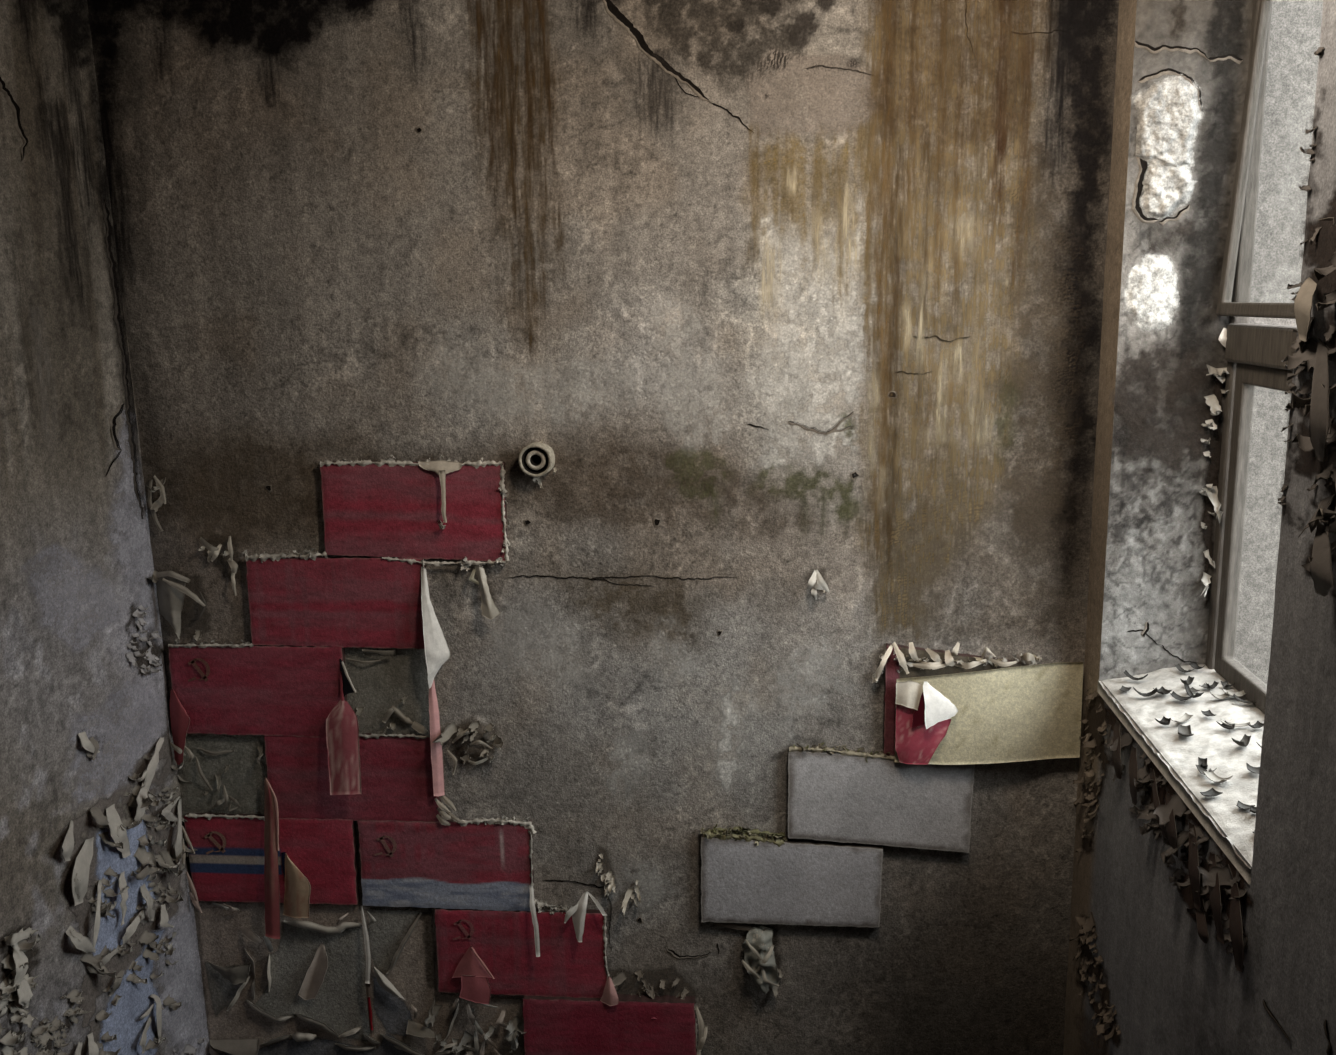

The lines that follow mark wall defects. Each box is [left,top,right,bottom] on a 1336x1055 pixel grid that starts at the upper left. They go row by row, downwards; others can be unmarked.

crack [602,0,753,132]
damp [645,0,834,128]
crack [806,65,879,79]
flaking render [1133,74,1204,219]
damp [19,0,376,473]
rust [859,0,1042,637]
peeling [1277,190,1336,597]
damp [501,448,813,531]
crack [508,575,736,586]
peeling [0,730,526,1055]
peeling [1073,687,1256,972]
crack [1323,1019,1332,1055]